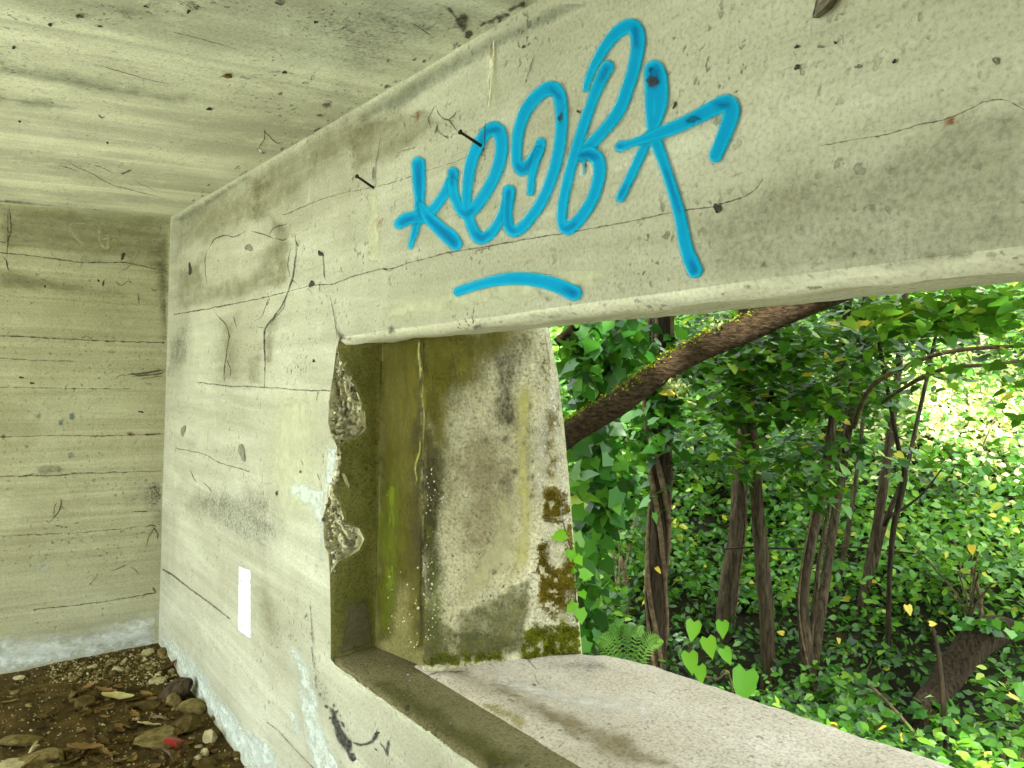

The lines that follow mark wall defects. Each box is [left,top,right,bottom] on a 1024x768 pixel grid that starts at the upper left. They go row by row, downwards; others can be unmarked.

crack [205,224,337,387]
spalling [321,345,366,573]
water stain [0,620,151,668]